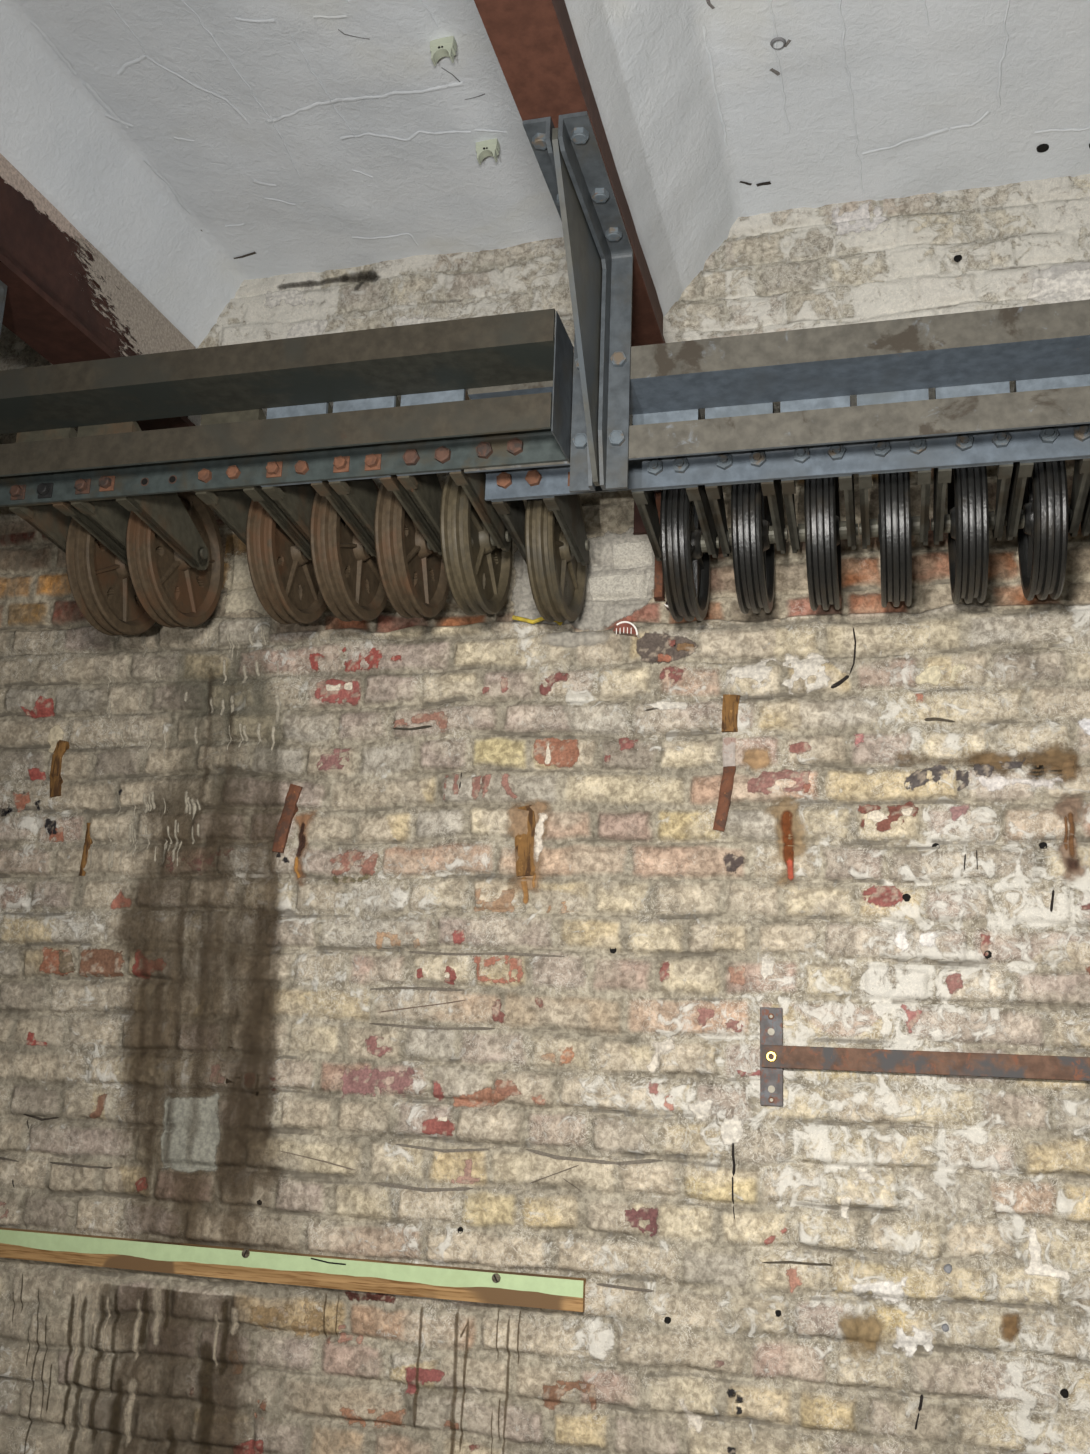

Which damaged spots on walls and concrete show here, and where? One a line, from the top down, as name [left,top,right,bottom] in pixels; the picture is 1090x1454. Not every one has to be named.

peeling [309,647,401,706]
leakage [91,792,201,867]
peeling [747,741,811,795]
rust [769,797,806,884]
rust [967,746,1085,880]
leakage [12,1276,173,1454]
leakage [201,1302,238,1454]
leakage [414,1310,422,1419]
leakage [451,1316,480,1454]
leakage [491,1311,521,1434]